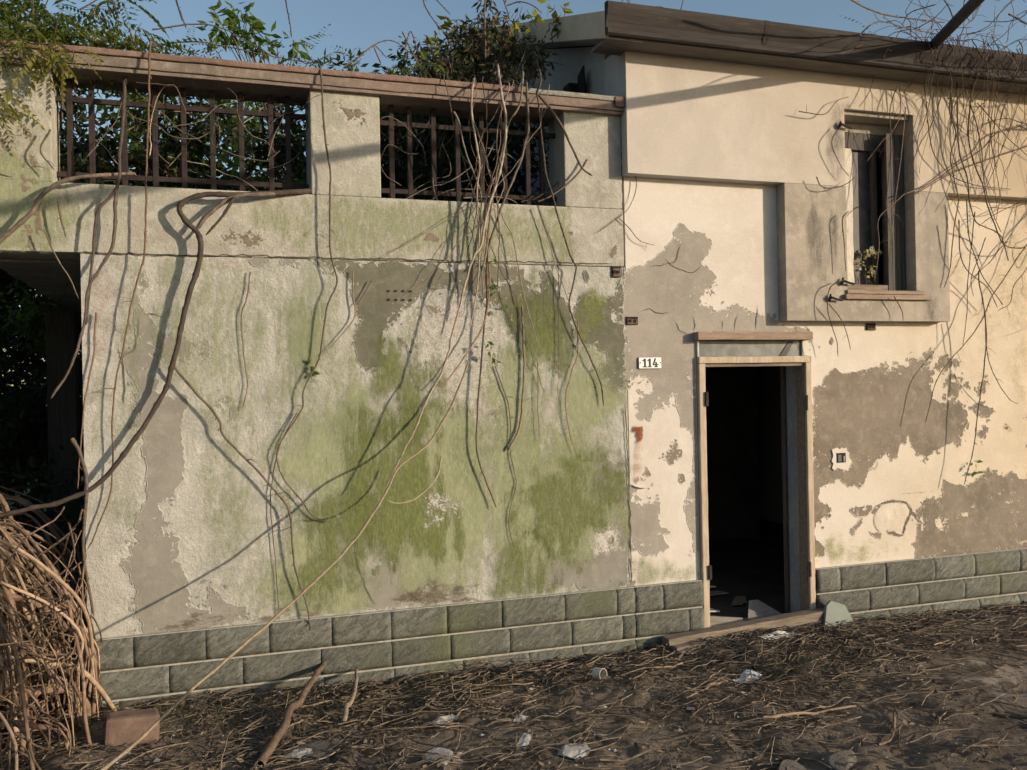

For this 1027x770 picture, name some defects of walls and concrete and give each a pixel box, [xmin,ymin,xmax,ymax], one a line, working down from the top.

peeling [117,270,249,634]
water stain [394,581,477,606]
peeling [220,222,834,557]
peeling [528,454,671,593]
water stain [590,523,623,558]
peeling [812,347,996,558]
peeling [849,466,1027,558]